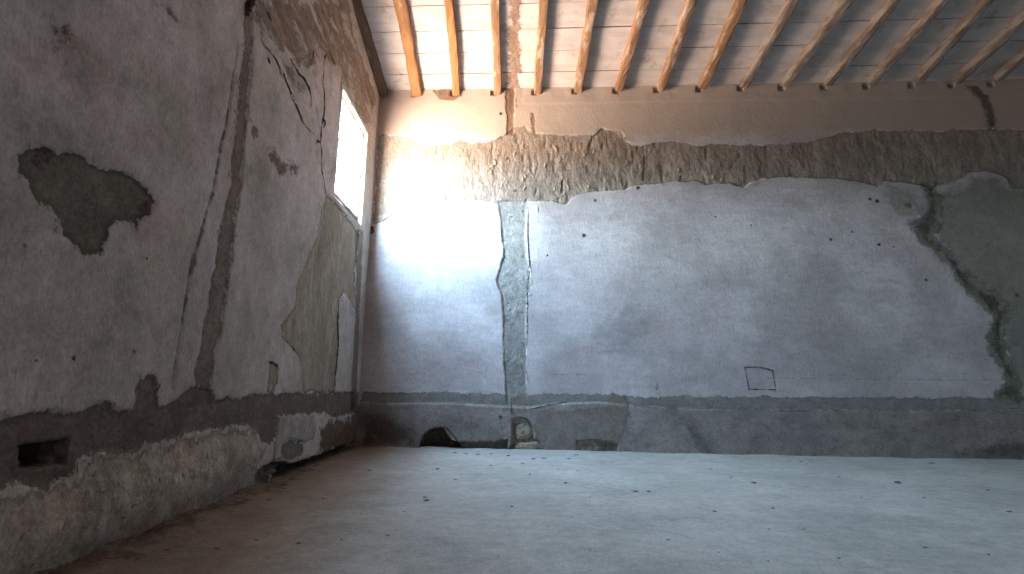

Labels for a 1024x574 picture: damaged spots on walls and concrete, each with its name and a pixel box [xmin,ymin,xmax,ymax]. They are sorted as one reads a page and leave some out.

crack [265,46,342,194]
peeling [0,126,1024,491]
damp [350,179,1024,460]